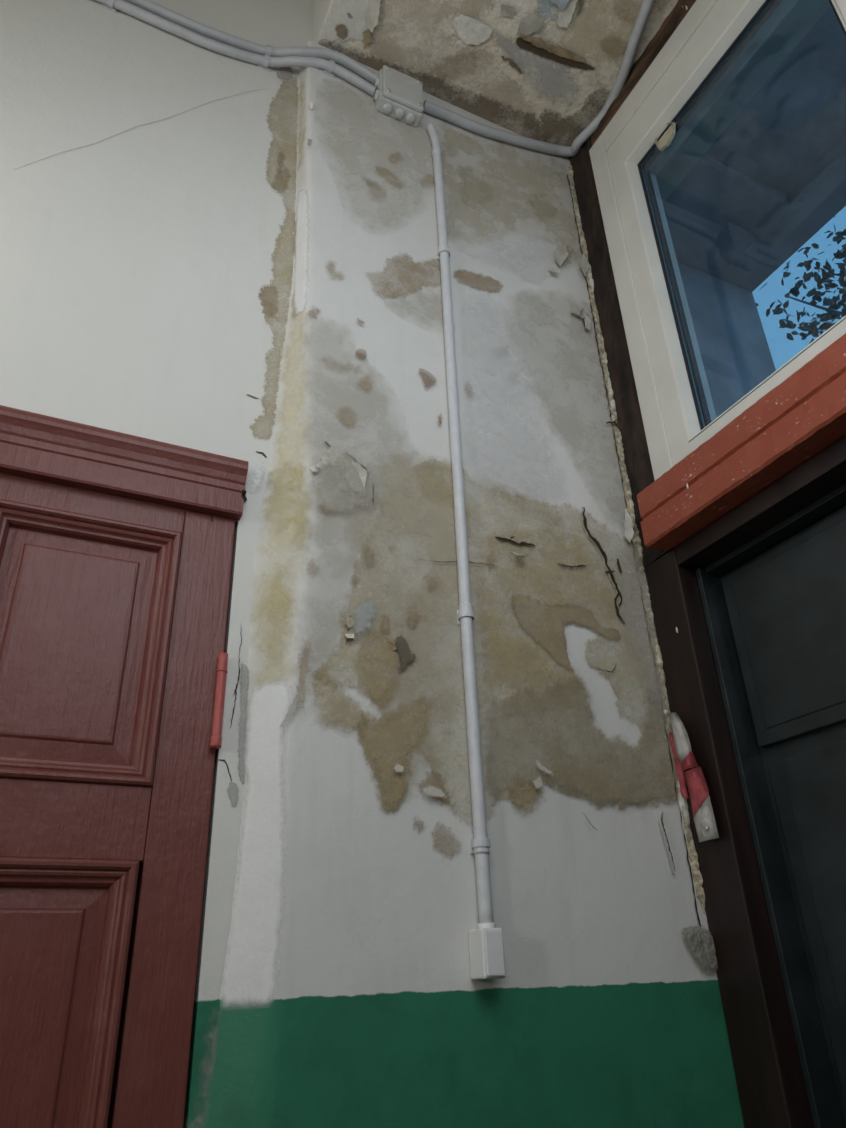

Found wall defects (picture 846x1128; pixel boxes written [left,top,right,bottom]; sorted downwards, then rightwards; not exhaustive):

peeling [363,0,381,46]
flaking render [452,14,493,45]
spalling [501,0,595,70]
damp [250,80,320,552]
damp [378,256,440,318]
damp [454,270,501,292]
crack [420,534,535,566]
damp [297,375,678,814]
crack [558,507,625,624]
damp [256,573,291,686]
spalling [387,635,417,671]
peeling [423,786,445,797]